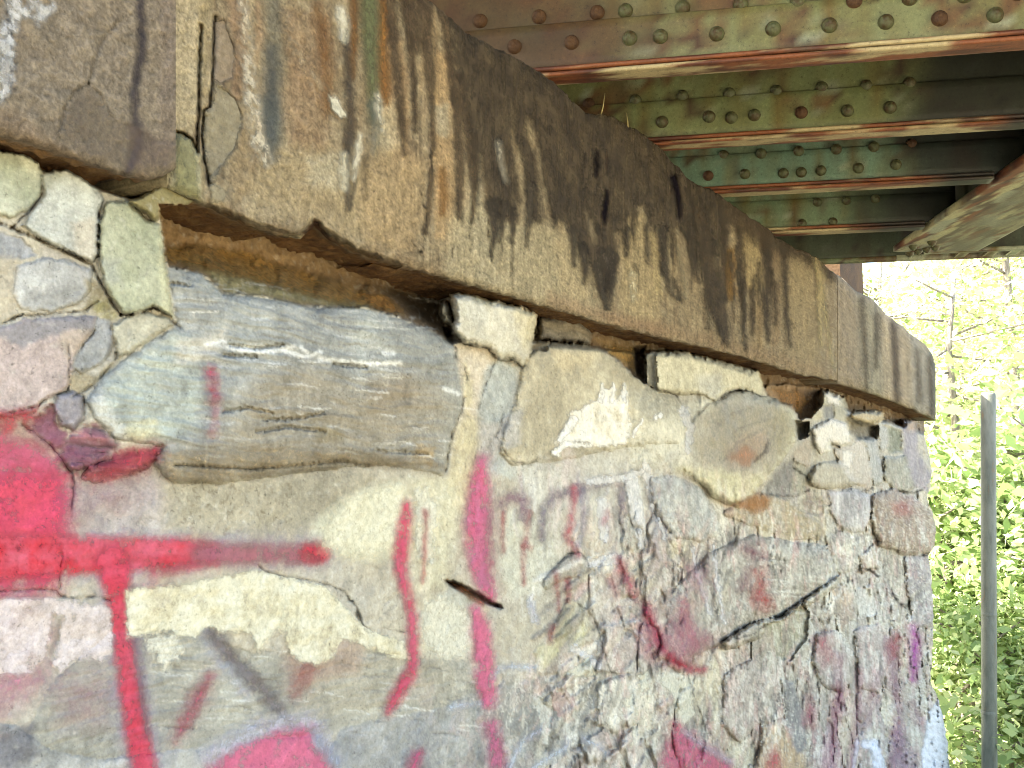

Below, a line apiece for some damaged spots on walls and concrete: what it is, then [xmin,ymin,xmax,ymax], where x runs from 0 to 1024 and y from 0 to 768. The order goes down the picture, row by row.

leakage [239,1,276,165]
spalling [273,221,381,261]
leakage [298,0,834,367]
peeling [552,383,663,457]